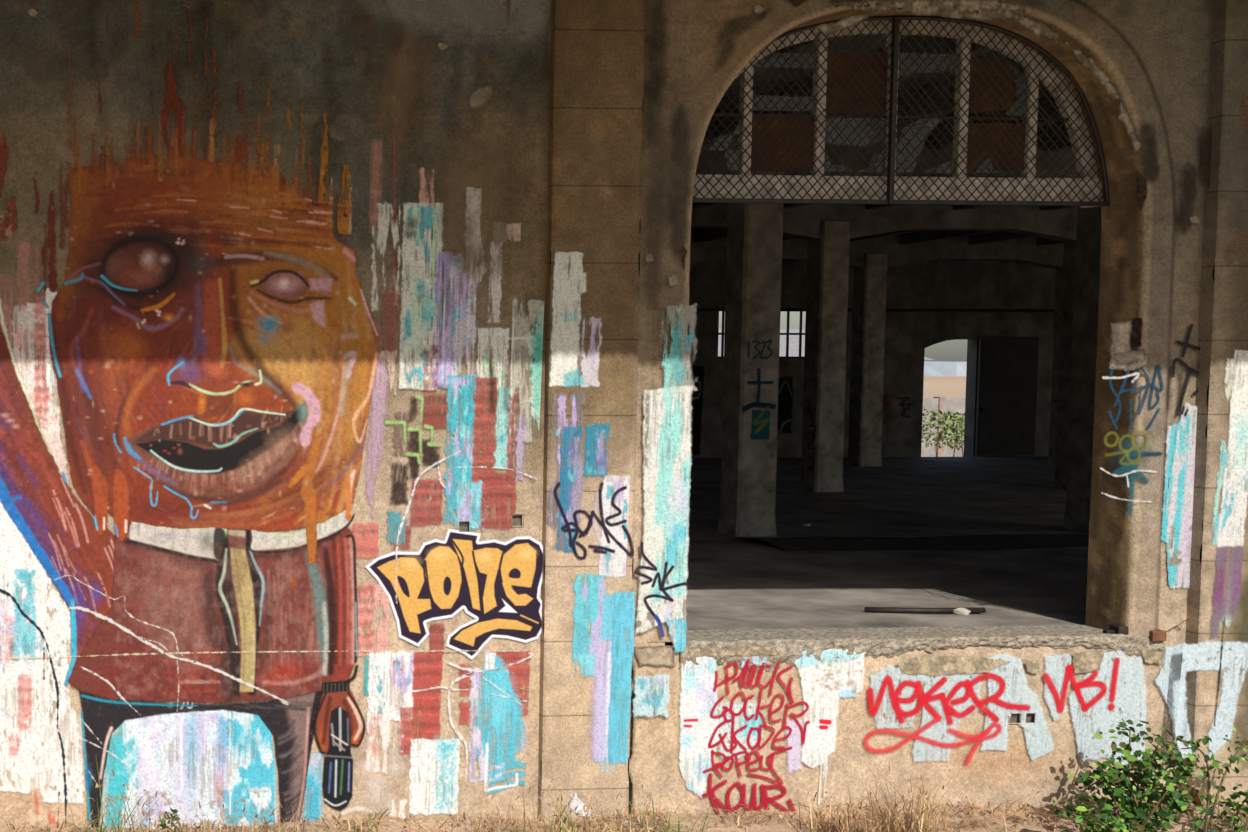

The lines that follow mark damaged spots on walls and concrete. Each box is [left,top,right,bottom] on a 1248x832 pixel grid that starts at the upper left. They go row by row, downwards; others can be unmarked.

water stain [719,8,771,65]
peeling [816,0,1141,153]
crack [0,589,520,828]